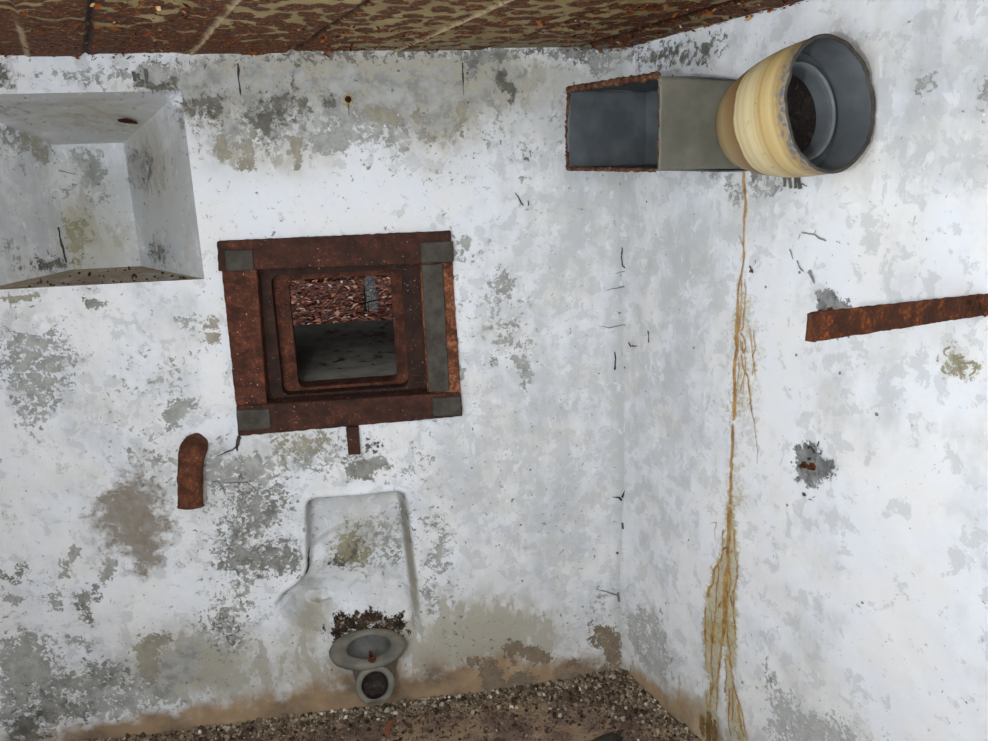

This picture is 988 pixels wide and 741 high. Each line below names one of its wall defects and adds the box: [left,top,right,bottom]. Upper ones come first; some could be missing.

rust [6,0,807,59]
rust [565,71,661,173]
peeling [173,313,222,345]
spalling [814,288,852,311]
peeling [0,324,85,443]
peeling [161,397,198,432]
rust [699,171,758,741]
spalling [792,440,838,500]
leakage [92,476,171,577]
peeling [0,544,174,723]
leakage [461,638,581,690]
leakage [586,620,622,671]